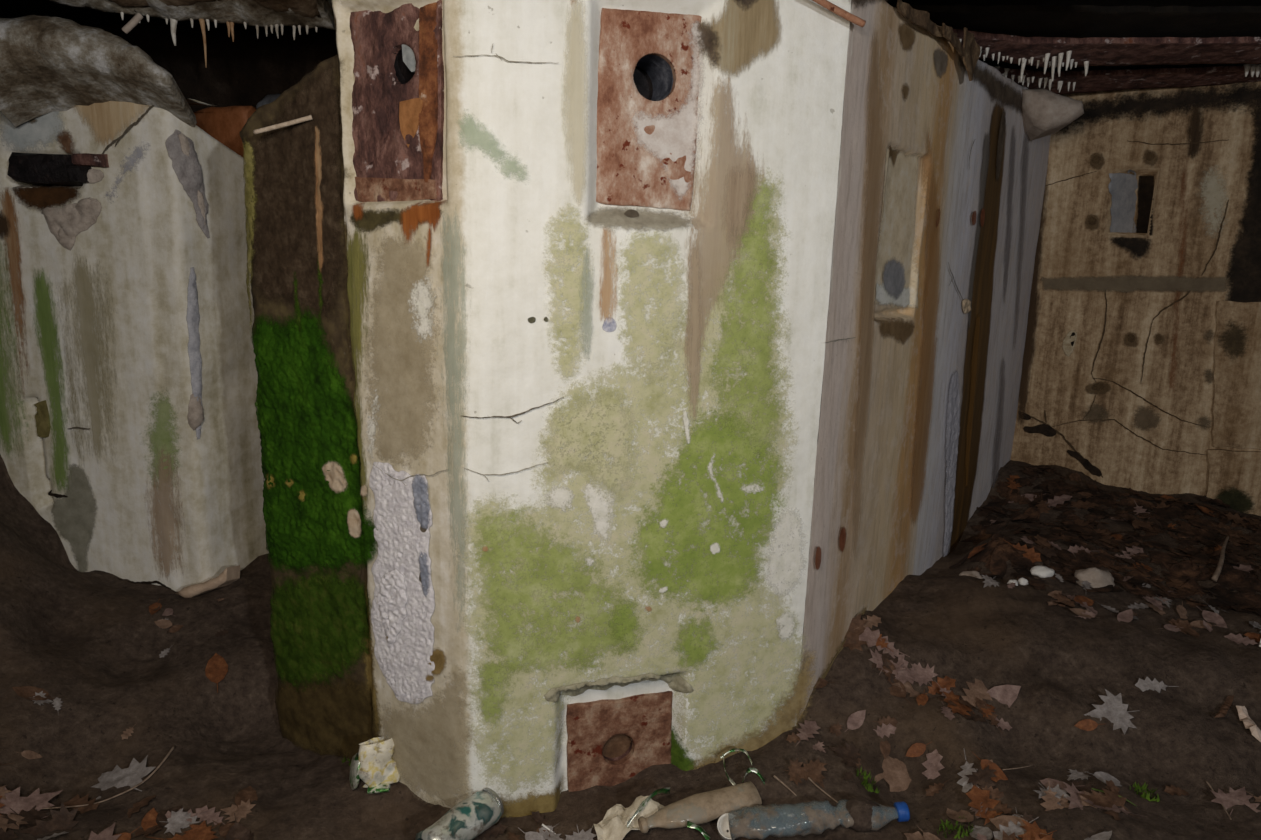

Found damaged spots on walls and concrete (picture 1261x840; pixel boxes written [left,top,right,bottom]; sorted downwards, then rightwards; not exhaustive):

rust [353,2,441,265]
crack [1129,138,1221,146]
peeling [322,462,346,493]
peeling [347,462,435,704]
crack [464,397,564,423]
water stain [934,49,1261,556]
crack [1020,200,1229,478]